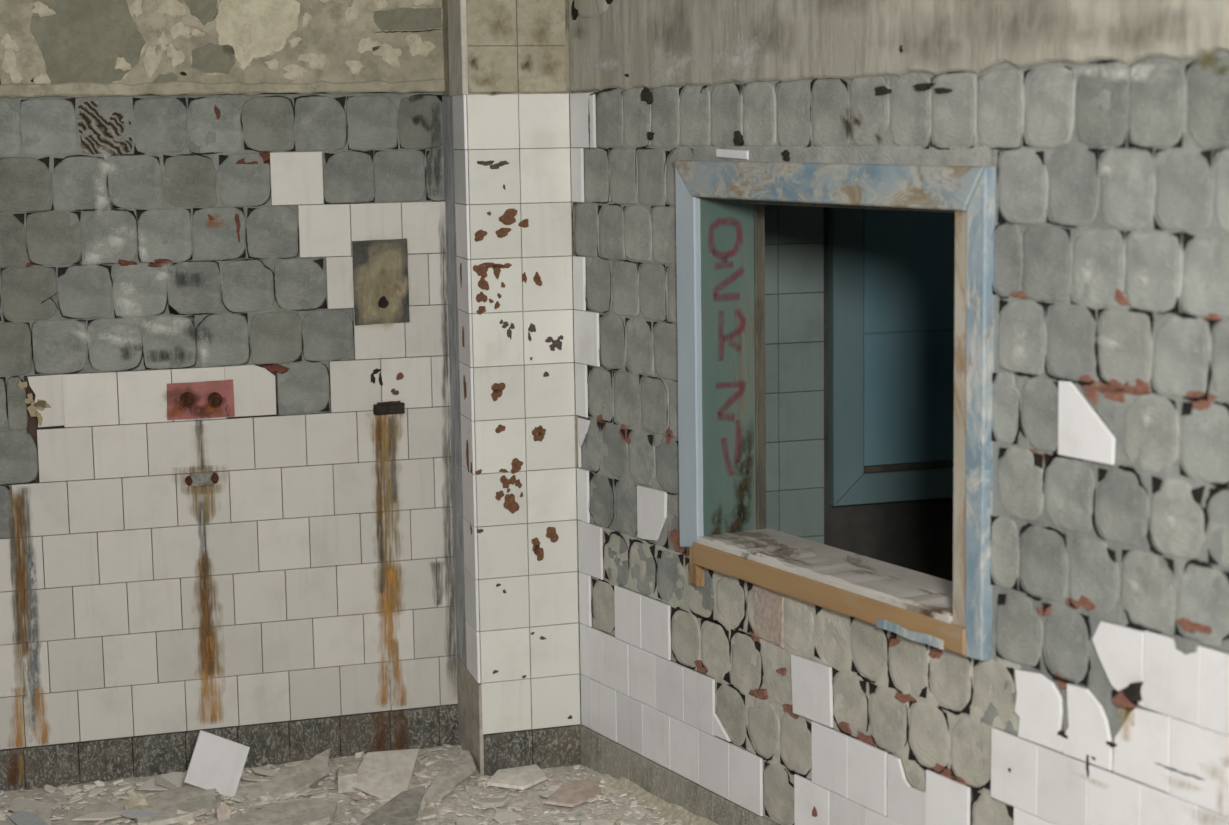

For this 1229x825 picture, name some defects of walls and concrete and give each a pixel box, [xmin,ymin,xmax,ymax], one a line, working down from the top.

spalling [0,0,445,538]
rust [8,489,48,785]
rust [184,406,220,722]
rust [375,414,405,750]
spalling [573,50,1229,825]